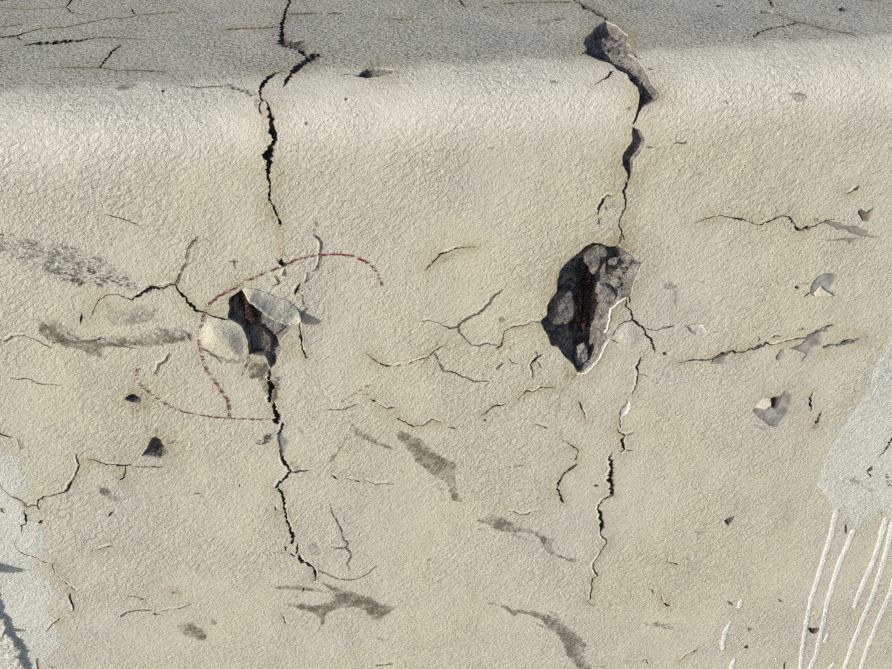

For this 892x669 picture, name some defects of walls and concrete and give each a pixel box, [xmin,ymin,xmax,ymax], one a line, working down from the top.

crack [0,0,175,72]
crack [225,0,342,226]
spalling [580,21,661,181]
crack [595,181,628,244]
crack [92,236,229,320]
spalling [227,258,302,376]
spalling [540,243,707,380]
peeling [794,273,837,298]
peeling [776,326,870,362]
peeling [753,391,793,427]
crack [0,453,159,632]
crack [586,418,635,607]